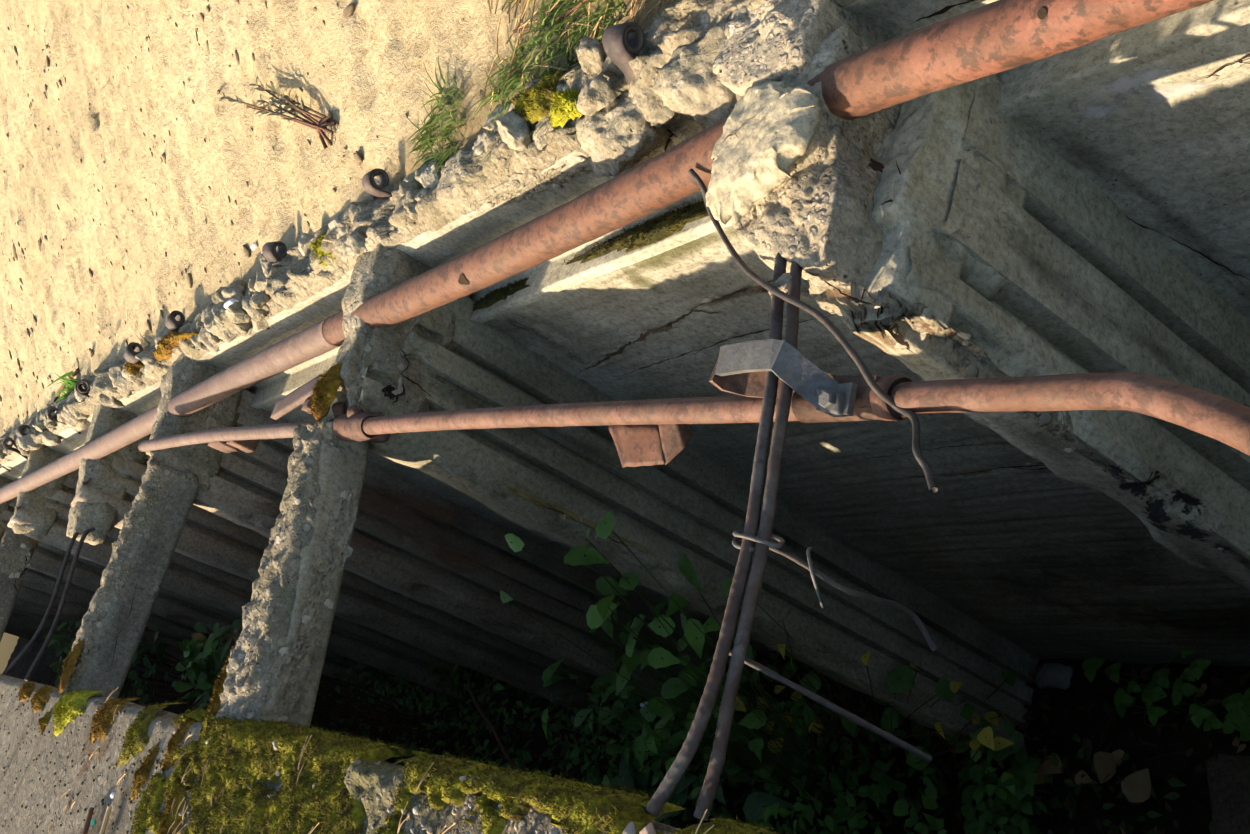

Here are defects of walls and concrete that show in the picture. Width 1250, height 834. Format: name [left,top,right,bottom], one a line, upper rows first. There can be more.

crack [1194,54,1250,82]
spalling [479,157,593,209]
crack [578,280,773,377]
rust [713,287,768,303]
rust [833,291,891,350]
rust [366,433,391,443]
damp [1104,464,1230,553]